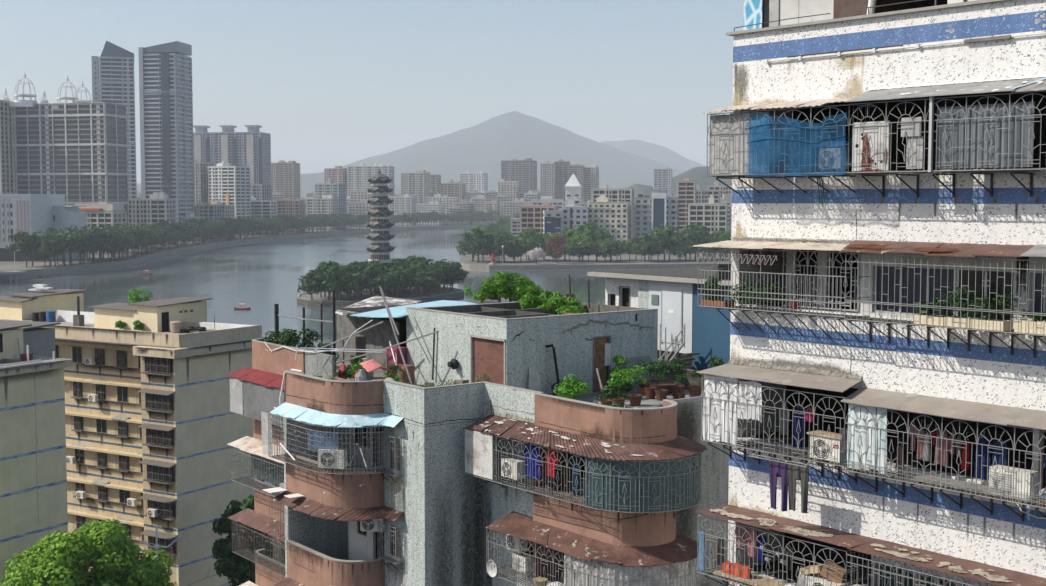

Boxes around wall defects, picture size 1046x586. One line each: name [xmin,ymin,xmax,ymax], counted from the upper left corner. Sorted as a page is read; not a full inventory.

water stain [734,64,747,99]
rust [858,134,887,172]
rust [849,244,957,252]
crack [563,314,654,340]
peeling [480,419,576,448]
water stain [464,481,491,586]
peeling [710,509,834,537]
peeling [870,543,1012,582]